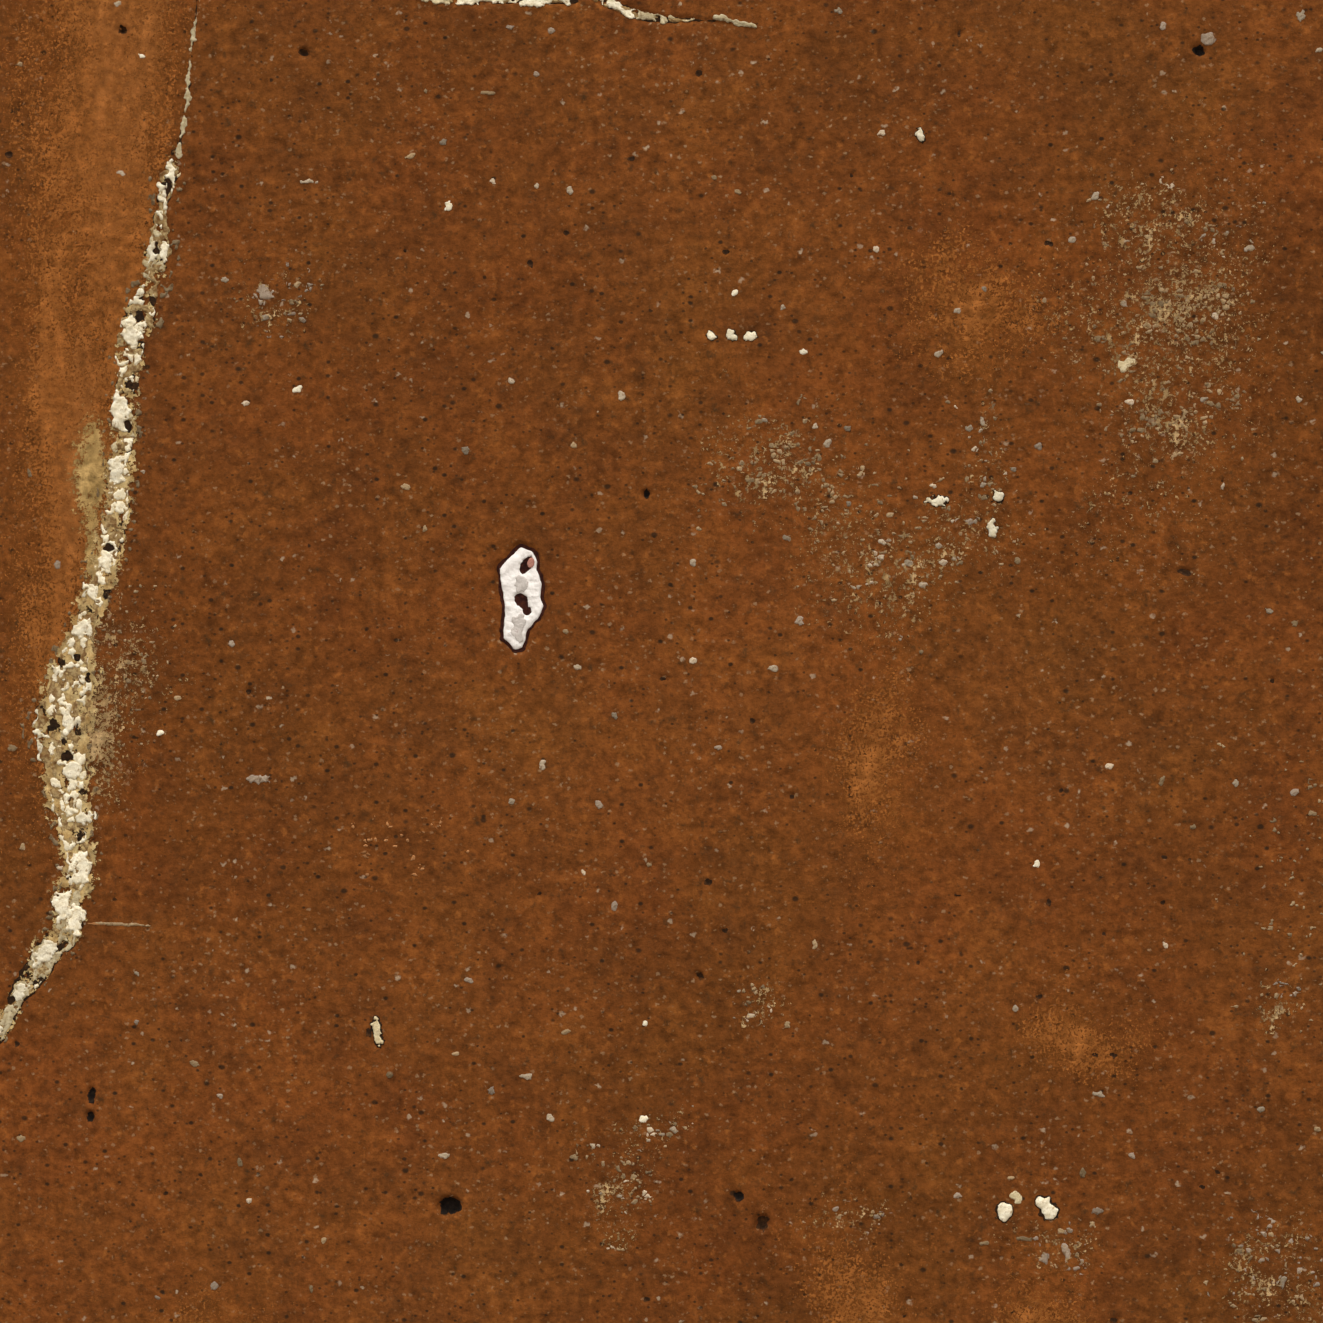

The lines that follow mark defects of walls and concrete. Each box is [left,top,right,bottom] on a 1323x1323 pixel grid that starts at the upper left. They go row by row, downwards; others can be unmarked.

crack [421,0,757,28]
crack [0,0,200,1044]
spalling [497,544,547,653]